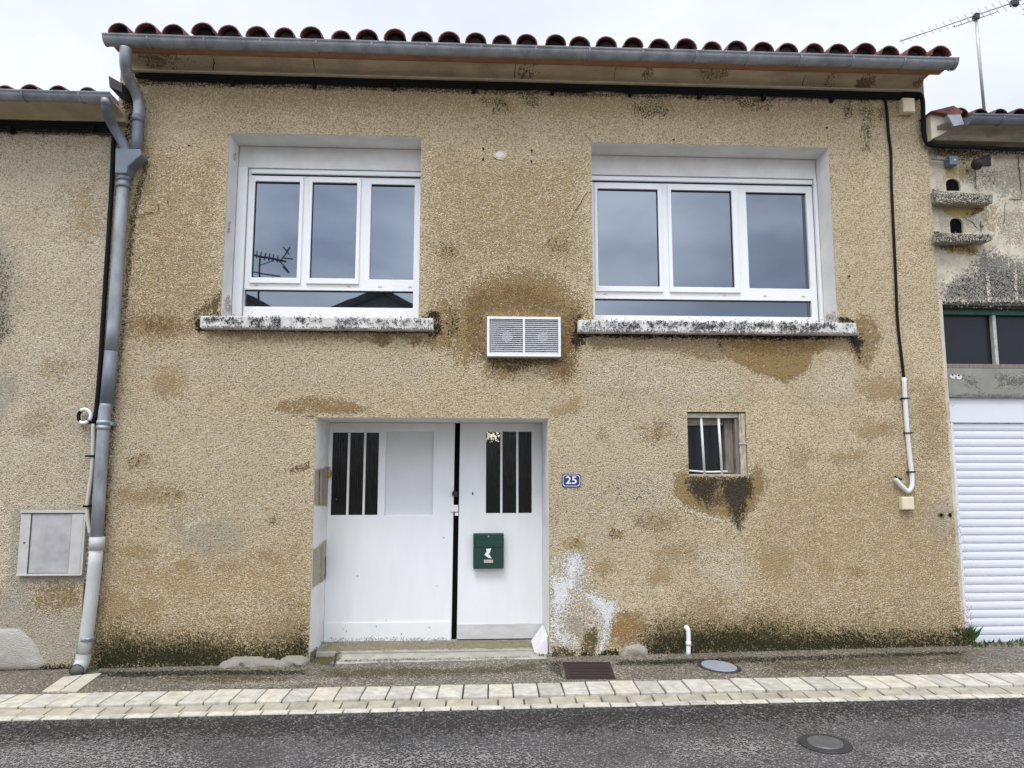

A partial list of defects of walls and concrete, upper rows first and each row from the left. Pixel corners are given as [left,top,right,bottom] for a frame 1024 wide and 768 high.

leakage [89,514,312,669]
leakage [110,137,981,654]